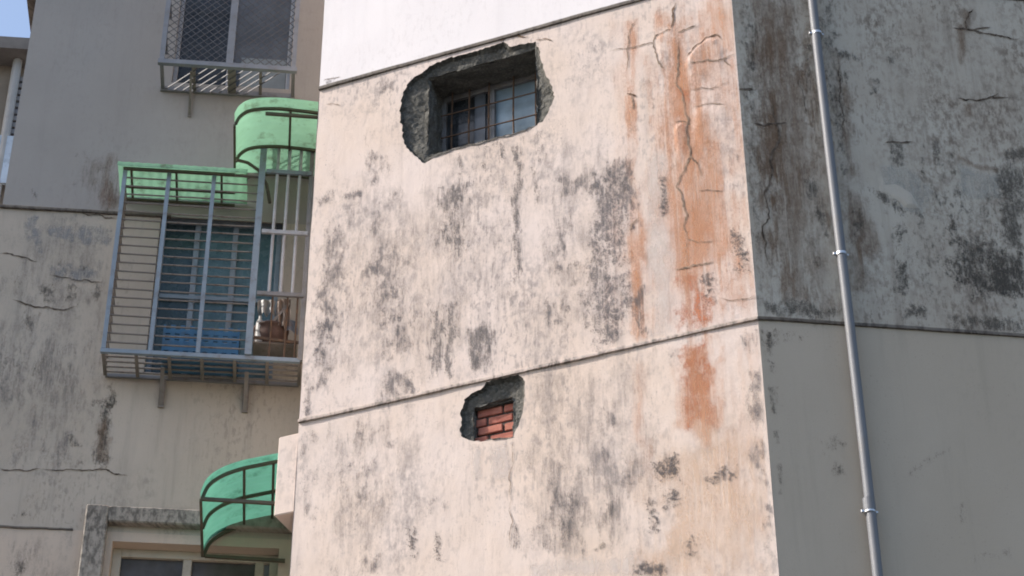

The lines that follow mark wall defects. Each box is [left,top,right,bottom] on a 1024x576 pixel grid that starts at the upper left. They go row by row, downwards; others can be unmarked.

crack [956,9,1012,39]
spalling [399,41,555,163]
crack [614,3,806,270]
leakage [500,143,535,271]
mould [558,161,646,343]
mould [945,150,1024,296]
crack [16,300,77,310]
spalling [460,375,525,442]
rust [685,344,717,441]
crack [0,467,122,475]
mould [646,452,681,532]
mould [633,561,667,575]